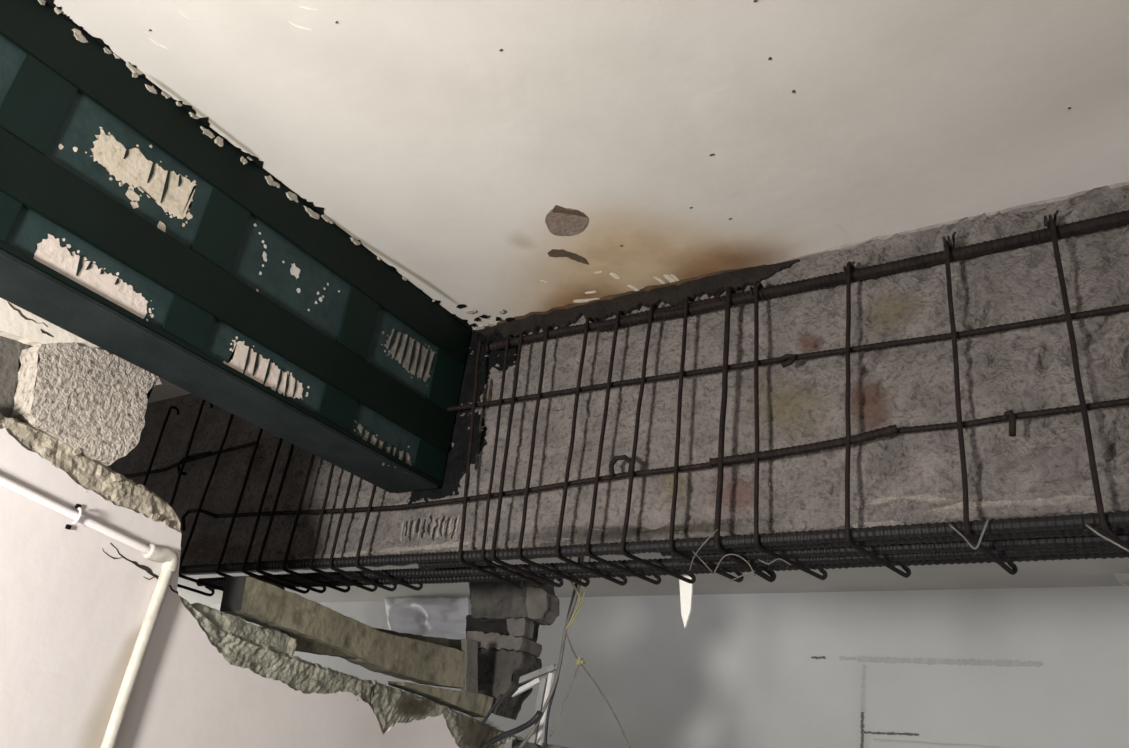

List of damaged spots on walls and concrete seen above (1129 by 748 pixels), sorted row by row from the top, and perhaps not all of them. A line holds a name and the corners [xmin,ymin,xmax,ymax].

flaking render [72,28,88,43]
flaking render [103,47,224,147]
flaking render [59,127,197,232]
flaking render [265,176,333,224]
flaking render [34,234,154,321]
flaking render [282,261,301,293]
spalling [456,189,1129,351]
flaking render [223,336,309,399]
flaking render [381,329,436,386]
spalling [447,304,1129,412]
spalling [0,413,256,533]
spalling [216,397,1129,518]